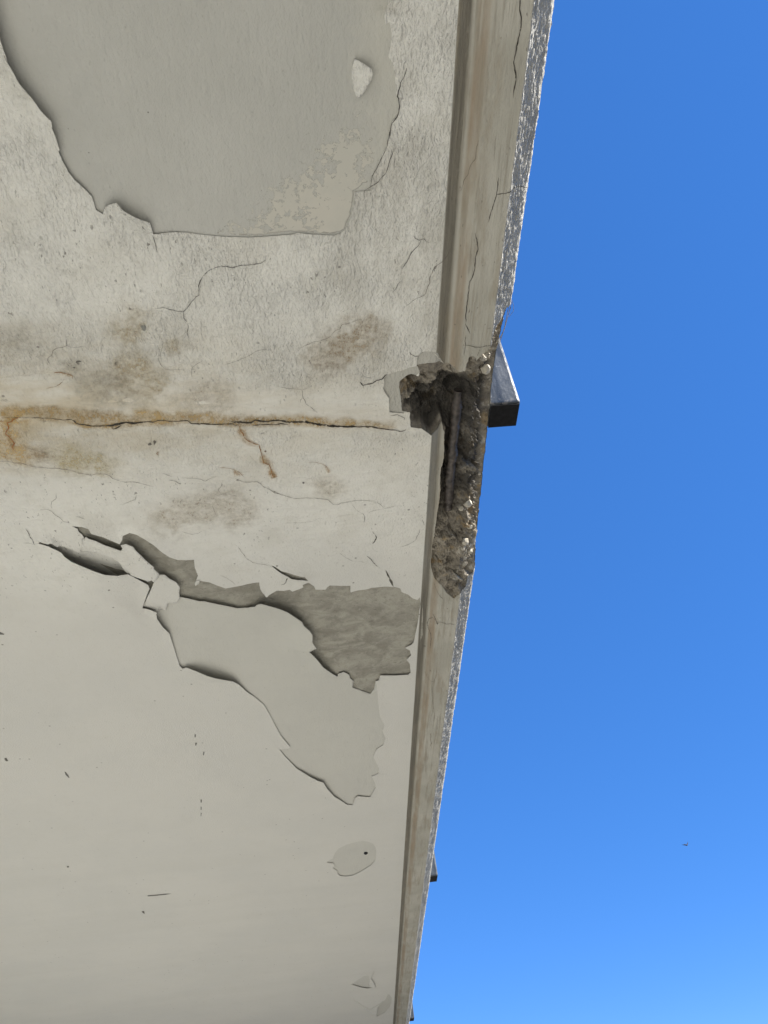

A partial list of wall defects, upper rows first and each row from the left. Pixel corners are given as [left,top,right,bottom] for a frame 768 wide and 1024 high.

crack [513,0,522,97]
peeling [0,0,415,249]
crack [364,60,407,191]
crack [157,261,264,335]
crack [395,238,449,305]
crack [410,182,527,363]
water stain [1,407,324,460]
crack [50,387,405,432]
spalling [373,313,504,598]
peeling [17,510,423,806]
peeling [323,841,379,878]